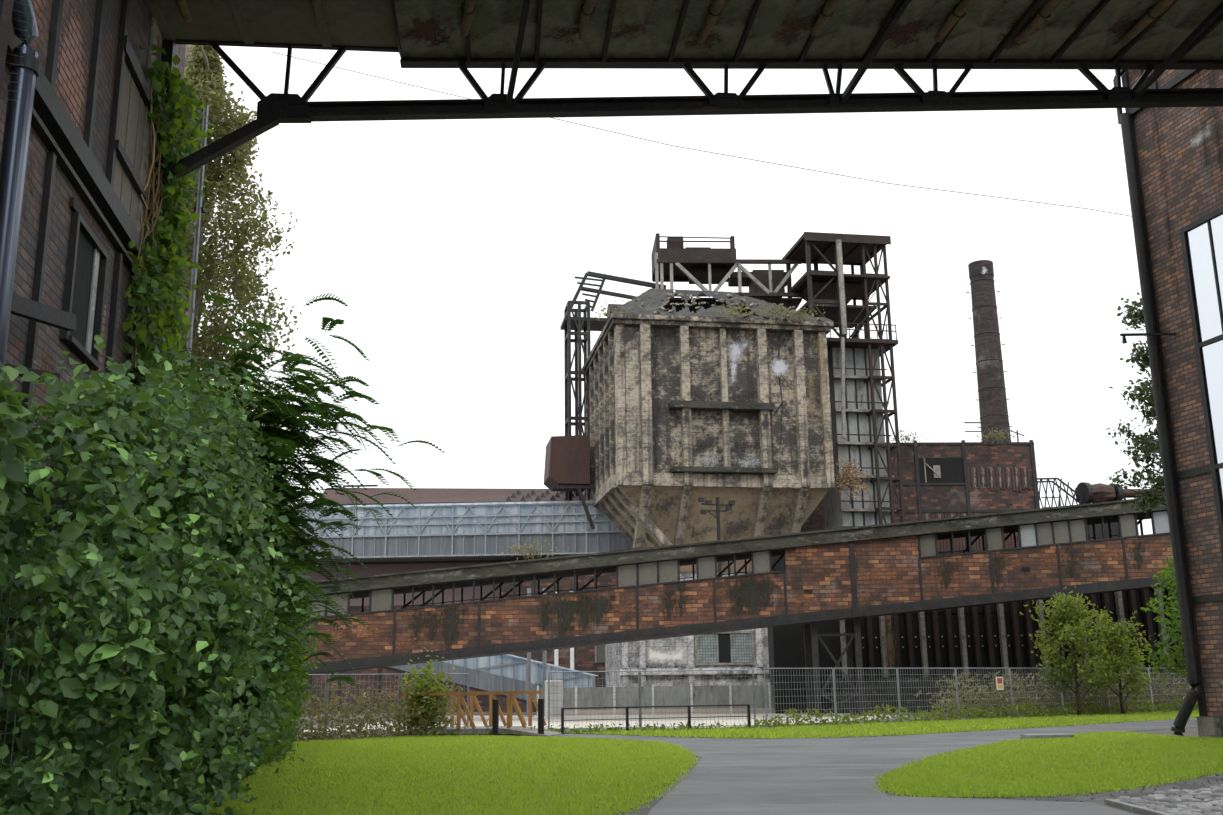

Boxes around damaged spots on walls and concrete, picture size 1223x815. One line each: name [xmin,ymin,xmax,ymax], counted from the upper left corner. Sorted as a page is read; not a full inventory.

leakage [621,327,638,357]
leakage [696,434,719,452]